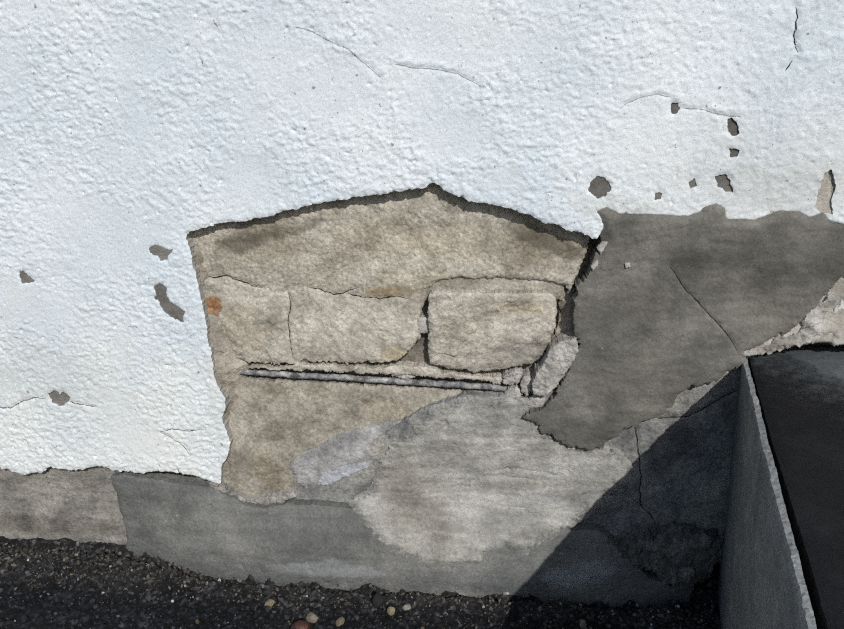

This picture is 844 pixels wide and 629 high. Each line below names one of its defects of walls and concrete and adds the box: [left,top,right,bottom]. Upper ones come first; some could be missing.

peeling [588,176,611,199]
peeling [814,170,835,214]
peeling [149,244,173,261]
peeling [20,271,35,283]
peeling [154,283,185,322]
corrosion [205,296,222,316]
crack [671,268,736,348]
flaking render [809,277,844,344]
spalling [192,183,598,505]
peeling [49,390,70,405]
crack [656,391,736,419]
crack [635,428,658,526]